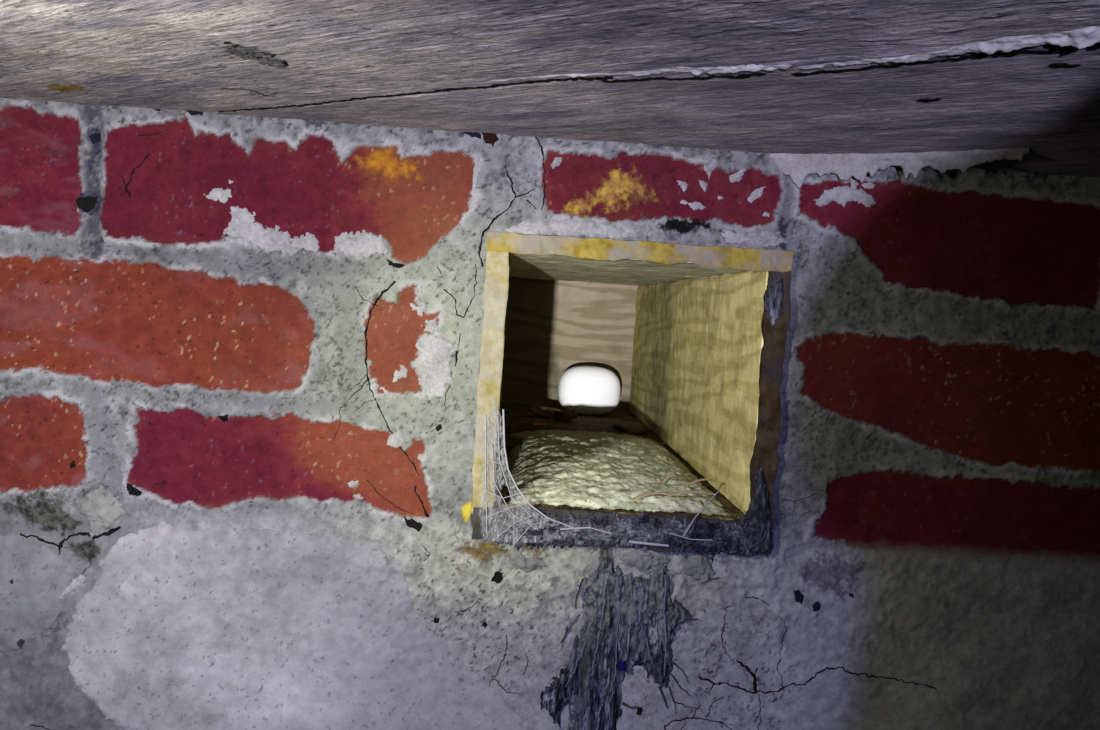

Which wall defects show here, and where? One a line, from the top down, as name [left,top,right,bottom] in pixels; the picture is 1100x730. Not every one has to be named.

crack [792,42,1100,76]
crack [218,72,766,112]
spalling [463,132,499,147]
peeling [677,157,717,210]
peeling [334,230,404,268]
crack [437,137,546,406]
peeling [410,303,441,333]
crack [333,281,429,517]
peeling [380,365,408,396]
spalling [126,483,142,496]
crack [20,526,121,583]
crack [664,596,937,730]